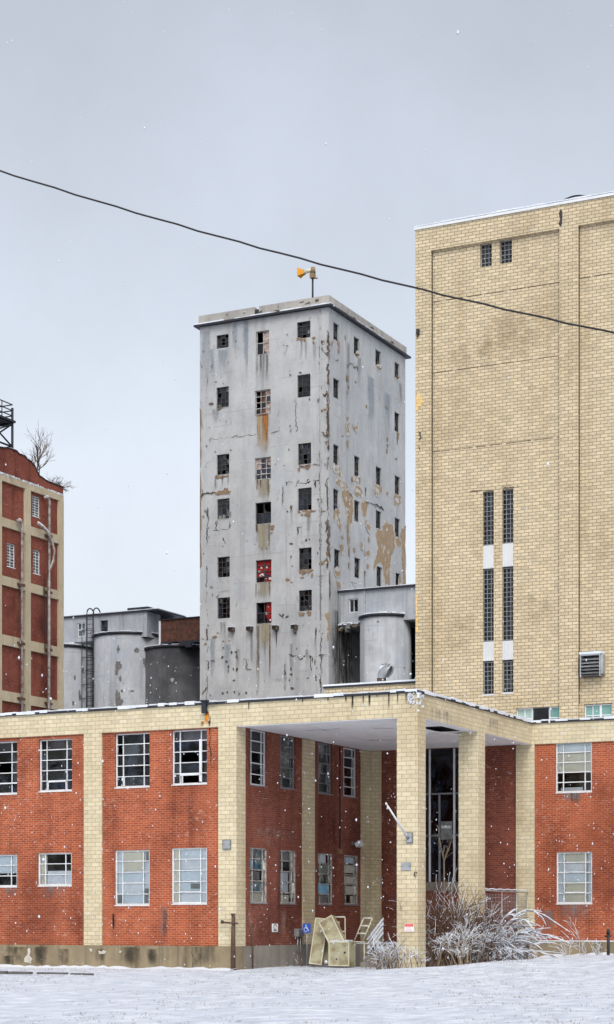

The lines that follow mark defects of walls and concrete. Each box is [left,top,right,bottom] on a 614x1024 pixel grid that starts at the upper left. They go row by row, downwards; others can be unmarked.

corrosion [257,414,268,441]
crack [210,330,357,694]
peeling [285,463,406,589]
peeling [115,645,134,706]
damp [35,947,46,961]
damp [125,947,136,962]